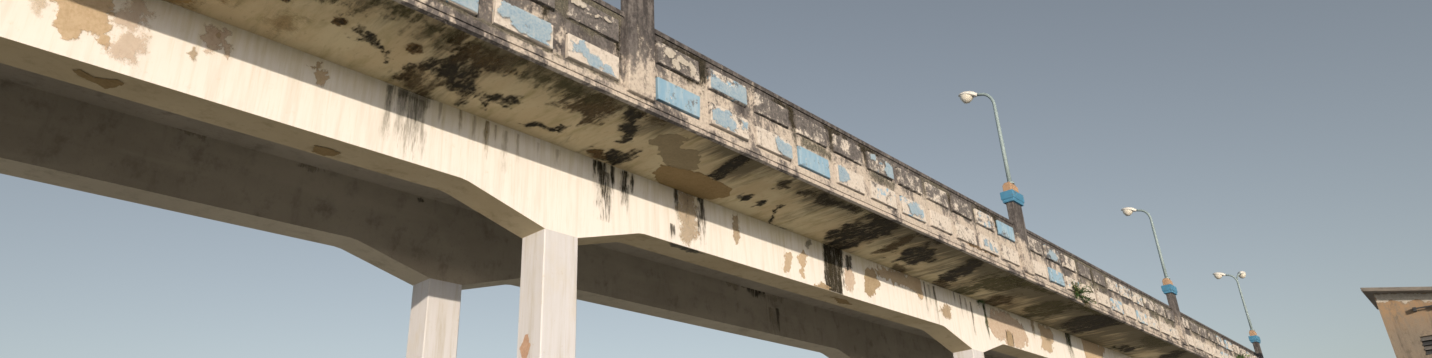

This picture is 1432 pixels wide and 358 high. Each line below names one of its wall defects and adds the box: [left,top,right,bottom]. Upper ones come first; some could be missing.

flaking render [50,0,153,62]
flaking render [188,24,232,60]
flaking render [73,69,124,89]
damp [353,0,666,217]
flaking render [648,134,732,200]
damp [708,155,753,181]
flaking render [732,216,740,244]
flaking render [784,240,923,299]
damp [737,180,1124,352]
flaking render [520,334,530,358]
flaking render [987,309,1054,352]
damp [1112,294,1218,358]